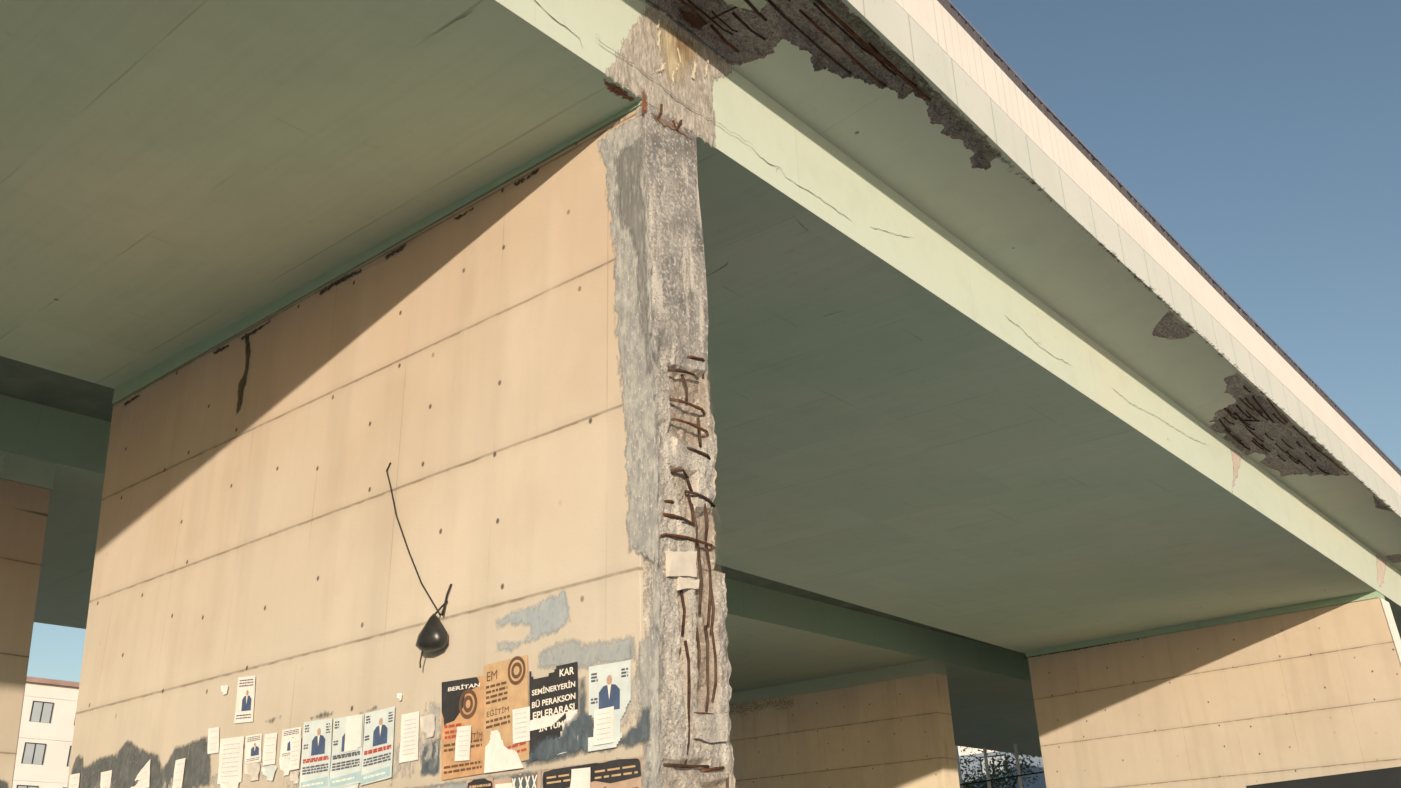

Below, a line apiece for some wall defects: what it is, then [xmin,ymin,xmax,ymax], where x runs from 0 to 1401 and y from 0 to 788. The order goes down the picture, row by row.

corrosion [661,9,707,79]
crack [535,0,913,238]
spalling [1152,310,1194,340]
spalling [598,0,1000,788]
spalling [1210,372,1349,477]